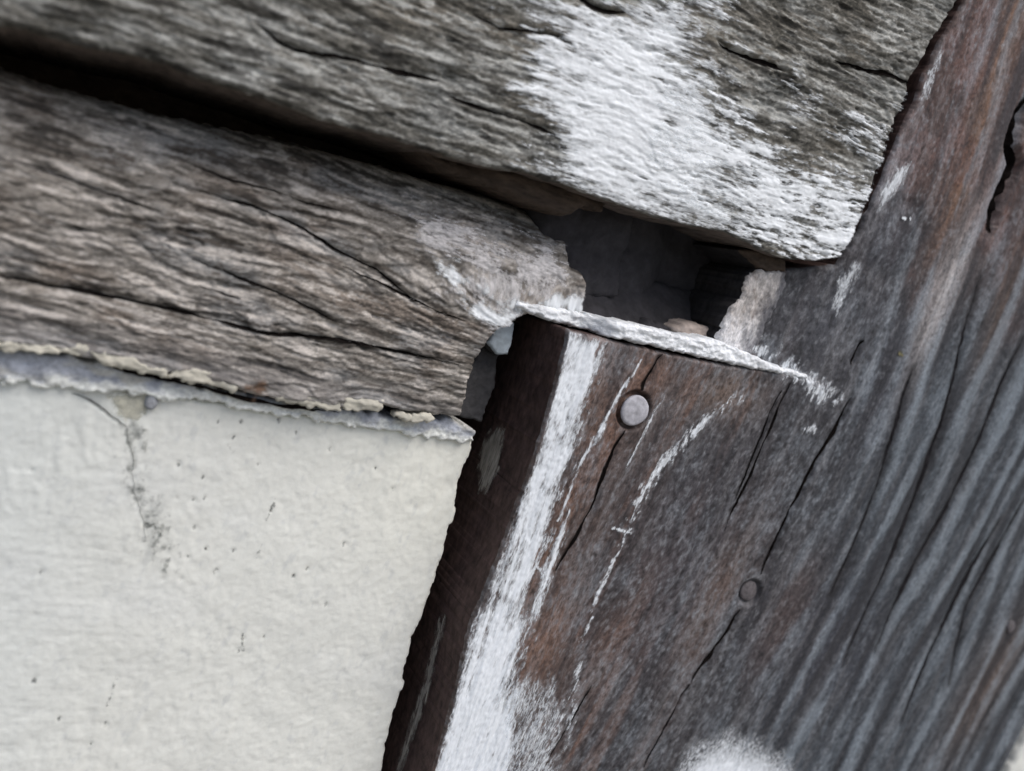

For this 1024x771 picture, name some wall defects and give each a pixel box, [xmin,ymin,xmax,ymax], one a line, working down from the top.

crack [986,99,1024,233]
crack [178,157,466,321]
crack [72,393,146,538]
peeling [0,341,239,394]
spalling [109,394,147,420]
peeling [271,390,435,423]
crack [556,430,626,570]
crack [641,354,663,391]
crack [724,383,791,531]
crack [761,398,851,574]
crack [643,609,740,768]